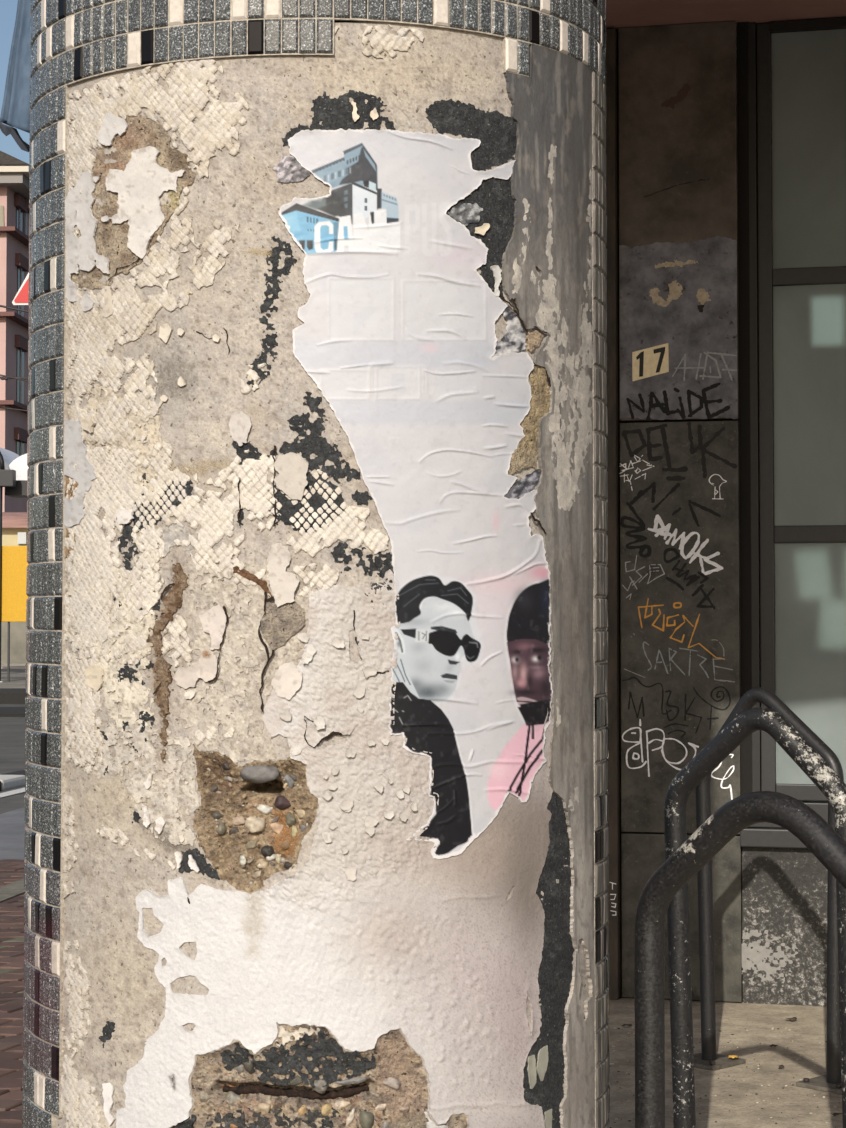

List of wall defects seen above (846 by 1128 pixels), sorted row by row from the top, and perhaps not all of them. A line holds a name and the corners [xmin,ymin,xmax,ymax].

corrosion [146,563,189,763]
crack [208,606,229,683]
crack [258,591,275,712]
peeling [57,59,562,1128]